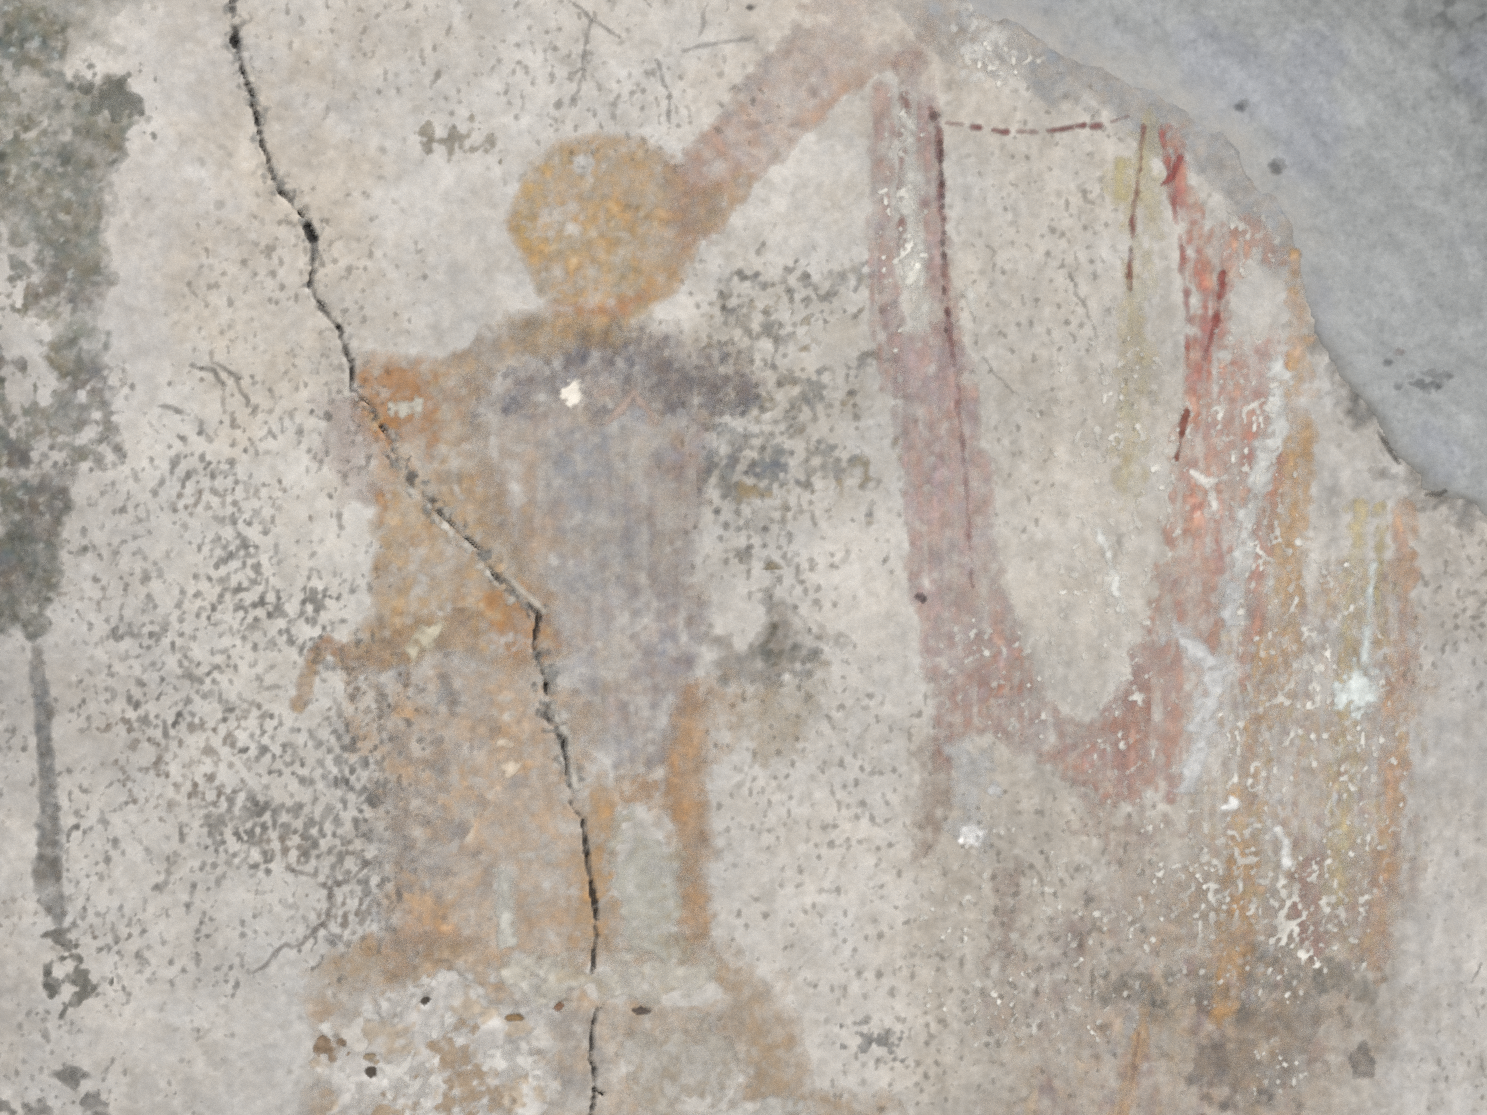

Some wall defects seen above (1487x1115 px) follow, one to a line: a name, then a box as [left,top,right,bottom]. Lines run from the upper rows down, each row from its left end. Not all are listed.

peeling [963,41,1042,87]
peeling [877,109,929,352]
peeling [1221,215,1278,276]
crack [225,0,598,972]
peeling [949,323,1406,1042]
peeling [920,917,1060,1047]
crack [589,1014,603,1111]
peeling [1253,1051,1307,1096]